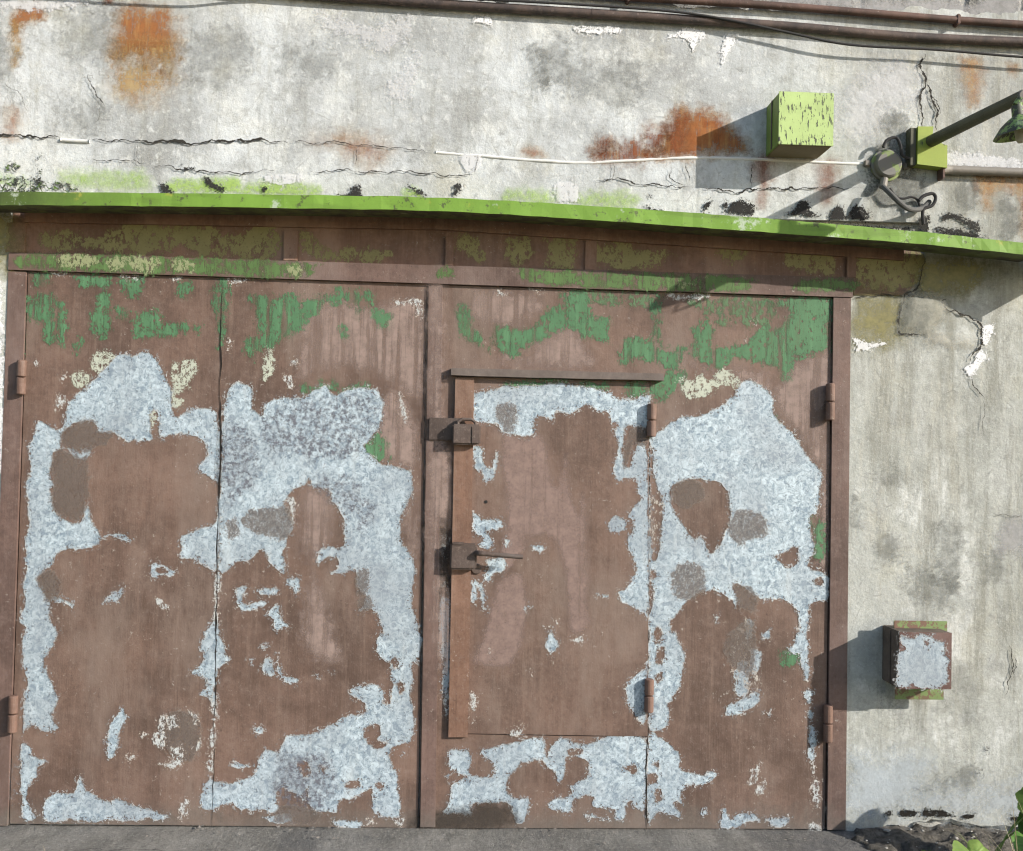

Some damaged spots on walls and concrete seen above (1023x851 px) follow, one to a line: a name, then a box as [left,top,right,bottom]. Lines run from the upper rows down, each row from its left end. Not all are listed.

rust [11,6,44,66]
crack [0,132,58,140]
rust [110,4,176,95]
crack [87,75,478,177]
rust [591,109,747,161]
crack [918,54,940,130]
crack [941,298,985,436]
peeling [980,323,995,348]
peeling [16,349,423,828]
peeling [443,378,830,826]
peeling [438,581,451,715]
peeling [718,808,793,830]